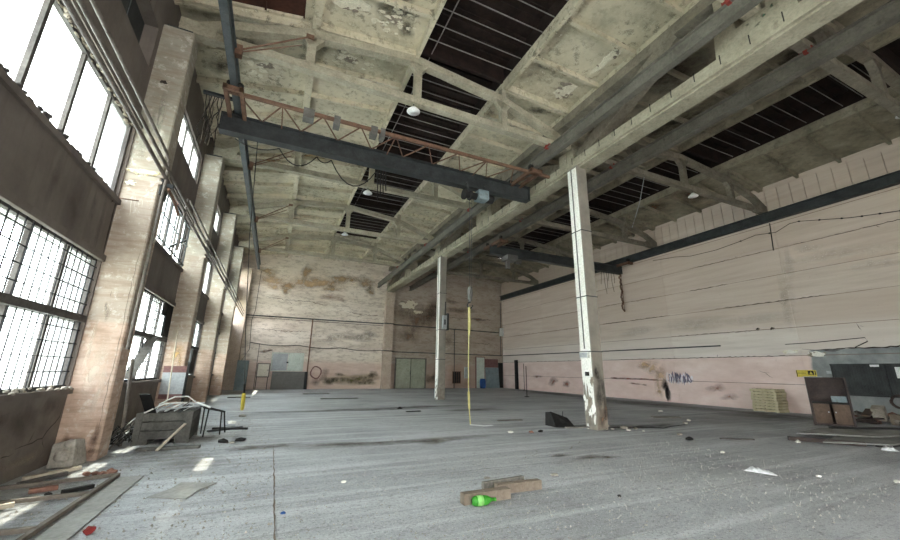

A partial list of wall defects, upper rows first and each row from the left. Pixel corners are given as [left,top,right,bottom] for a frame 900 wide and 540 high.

peeling [332,0,416,35]
water stain [263,268,374,294]
peeling [398,300,423,314]
spalling [583,377,596,429]